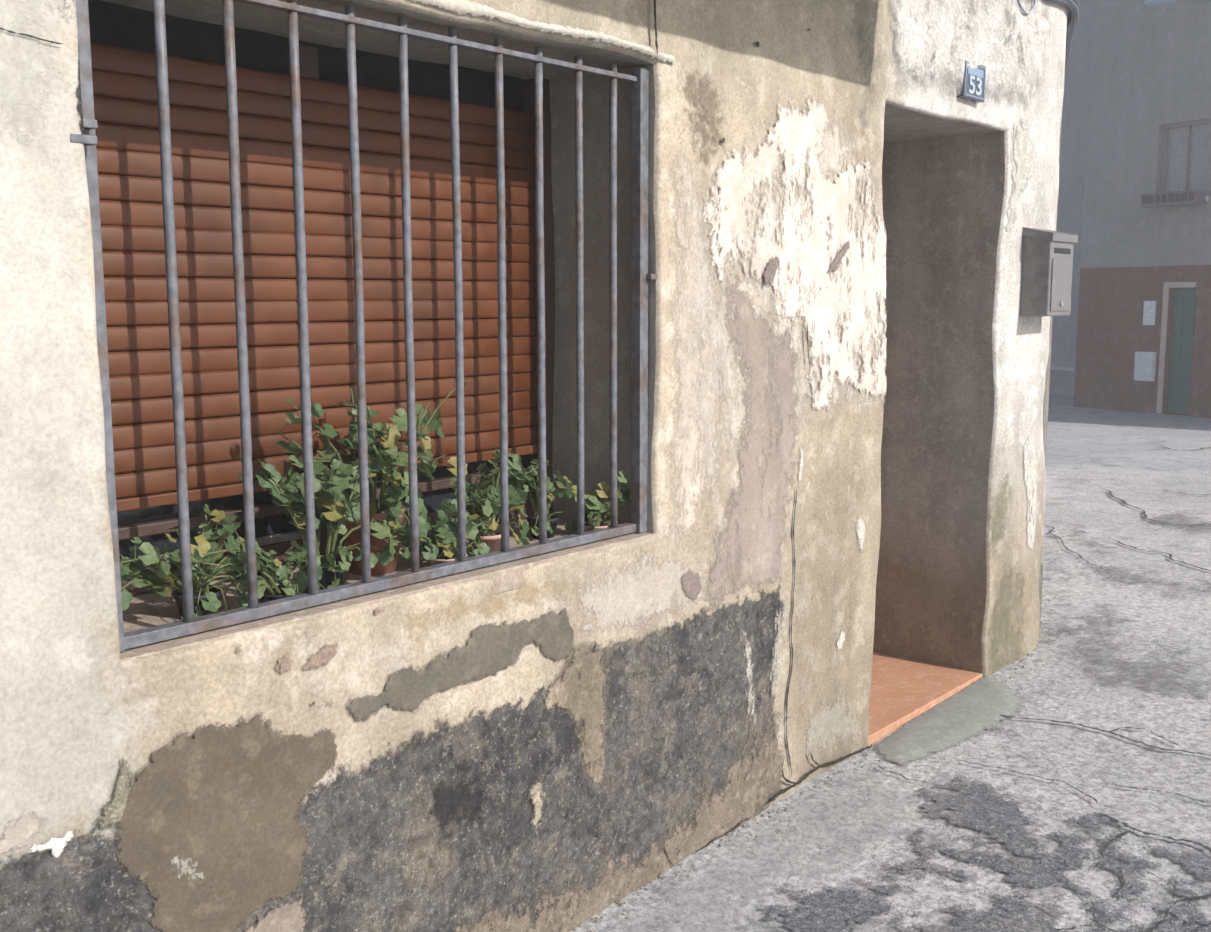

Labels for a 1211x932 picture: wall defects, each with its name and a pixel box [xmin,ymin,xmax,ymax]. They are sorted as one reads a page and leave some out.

crack [0,28,66,45]
crack [651,0,659,54]
peeling [541,69,887,785]
crack [1096,486,1204,525]
crack [1044,524,1211,571]
damp [740,598,789,730]
crack [665,485,927,867]
crack [1000,715,1211,756]
spalling [528,782,546,830]
peeling [171,856,204,880]
crack [958,760,1211,932]
spalling [245,891,307,932]